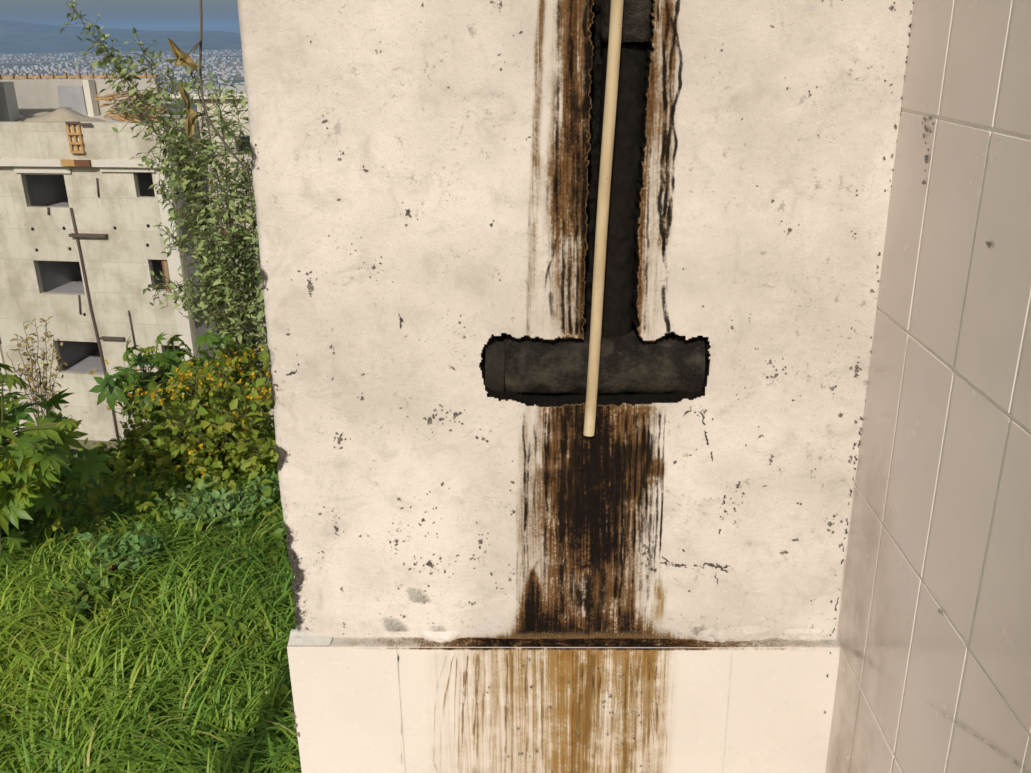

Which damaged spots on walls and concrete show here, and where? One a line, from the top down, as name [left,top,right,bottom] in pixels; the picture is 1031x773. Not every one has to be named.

spalling [275,444,291,471]
spalling [283,522,309,631]
rust [655,584,664,616]
rust [444,649,669,773]